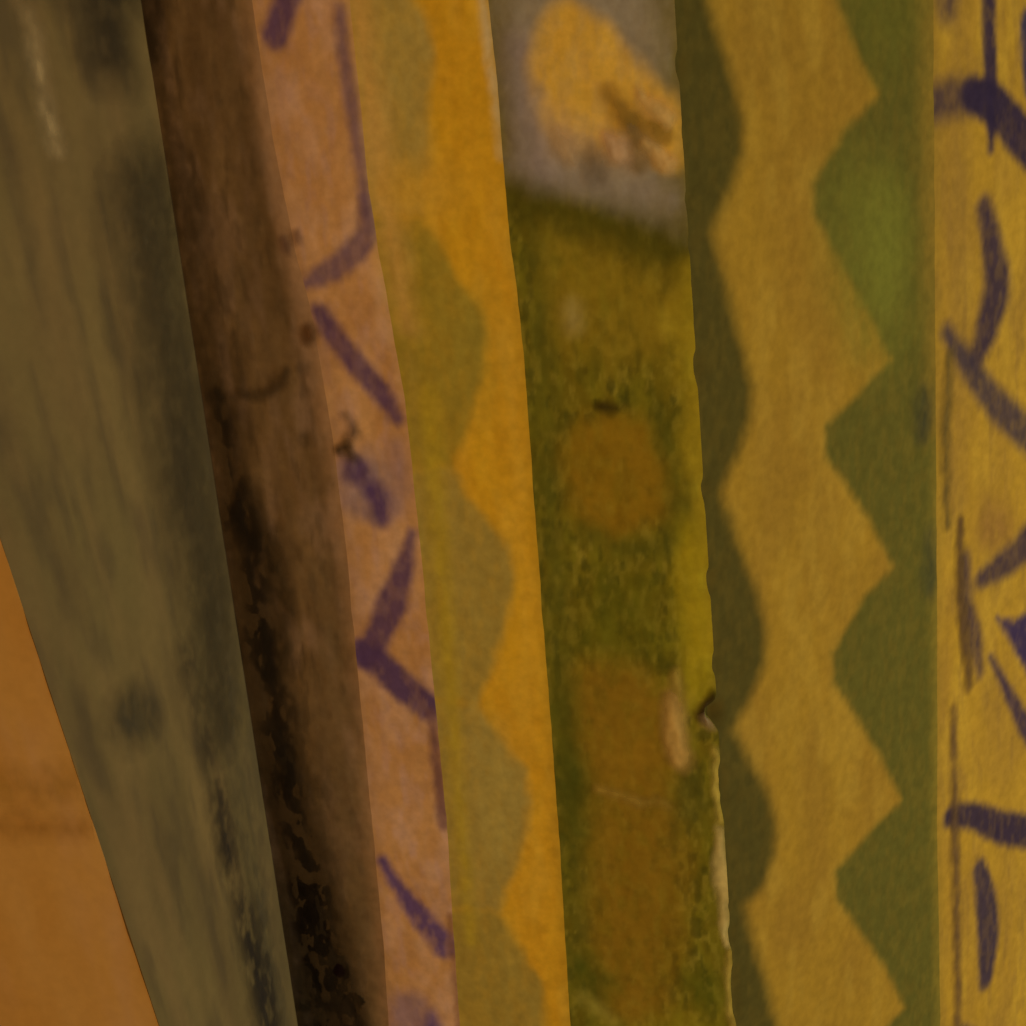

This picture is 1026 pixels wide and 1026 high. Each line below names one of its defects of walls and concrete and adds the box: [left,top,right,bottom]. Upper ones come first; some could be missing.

water stain [229,473,353,1026]